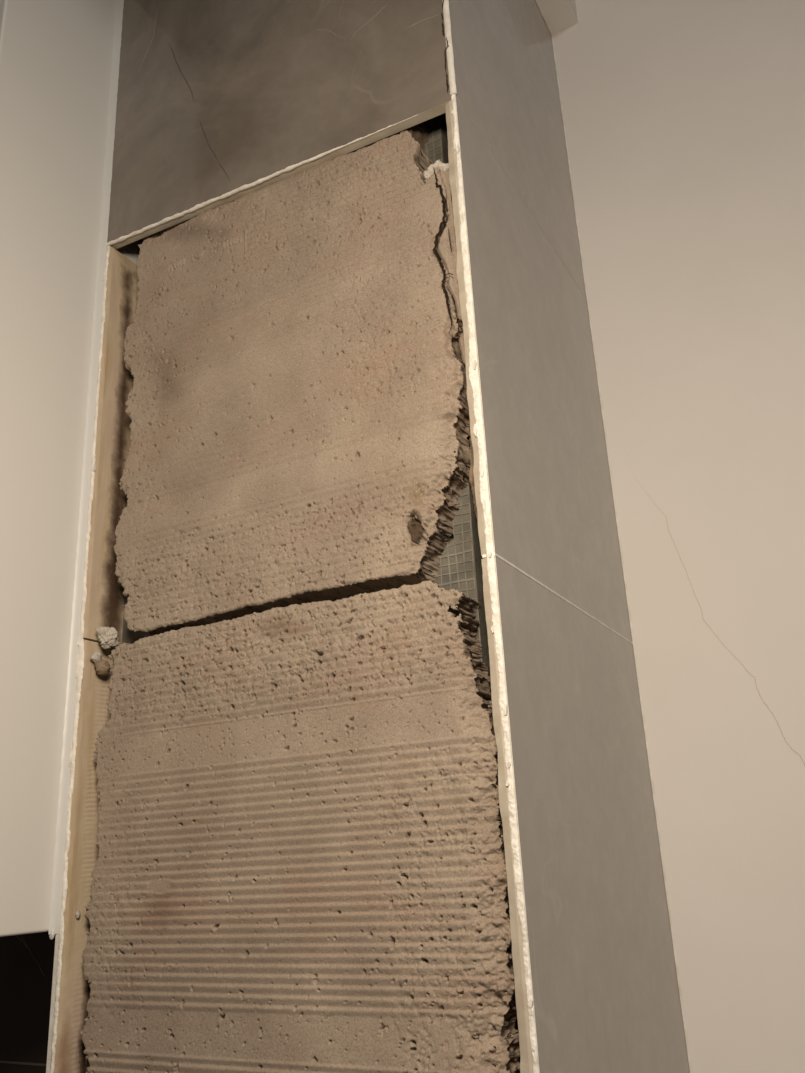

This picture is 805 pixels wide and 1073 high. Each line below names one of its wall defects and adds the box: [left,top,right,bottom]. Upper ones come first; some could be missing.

spalling [408,510,424,546]
spalling [451,93,540,1073]
crack [626,453,805,766]